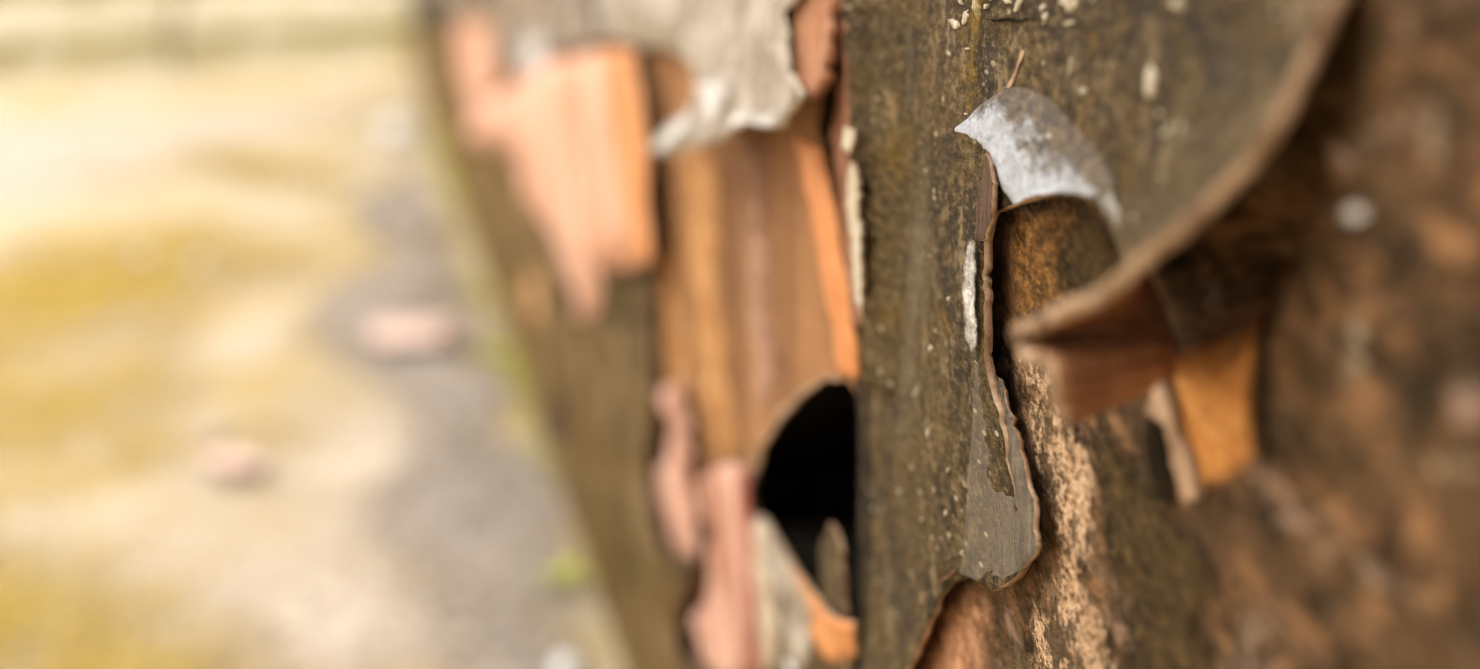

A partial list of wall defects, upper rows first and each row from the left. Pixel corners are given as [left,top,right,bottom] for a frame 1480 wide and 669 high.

spalling [455,0,932,669]
spalling [890,0,1480,669]